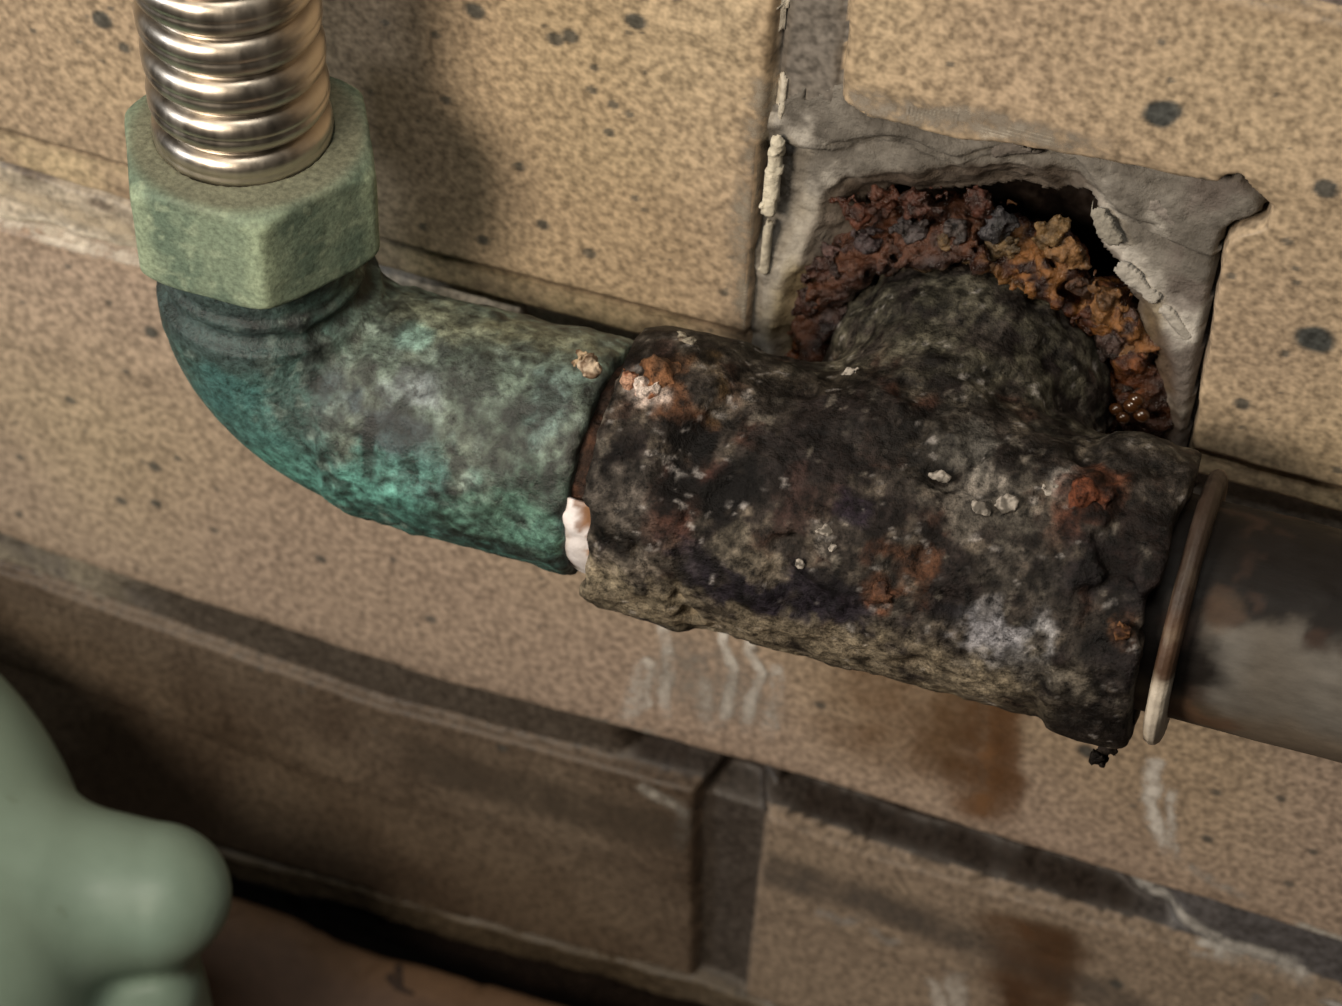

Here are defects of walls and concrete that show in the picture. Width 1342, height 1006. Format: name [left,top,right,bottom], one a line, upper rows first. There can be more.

peeling [777,0,790,32]
spalling [751,72,1268,447]
damp [627,626,782,724]
damp [1142,759,1177,850]
damp [1134,877,1310,976]
damp [1297,923,1342,941]